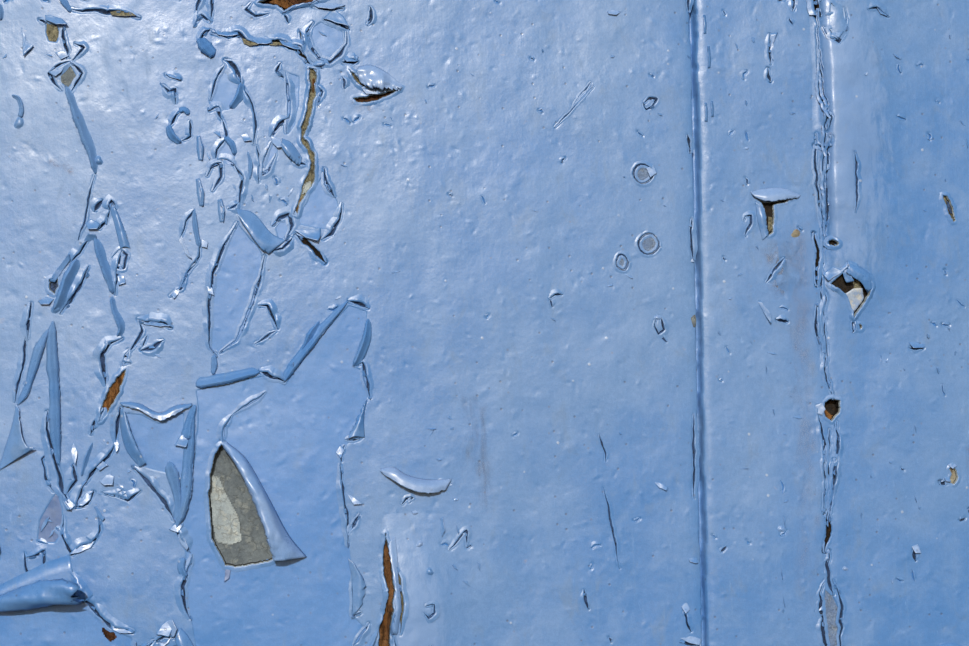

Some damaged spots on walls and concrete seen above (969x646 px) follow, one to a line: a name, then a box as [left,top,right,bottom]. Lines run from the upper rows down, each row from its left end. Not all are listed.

crack [71,0,141,19]
crack [210,25,329,219]
peeling [342,52,405,124]
crack [196,136,240,222]
peeling [742,177,800,250]
peeling [939,179,958,226]
peeling [0,0,378,646]
crack [806,0,862,646]
peeling [823,260,876,334]
rust [88,349,132,436]
spalling [815,394,844,425]
peeling [380,467,452,514]